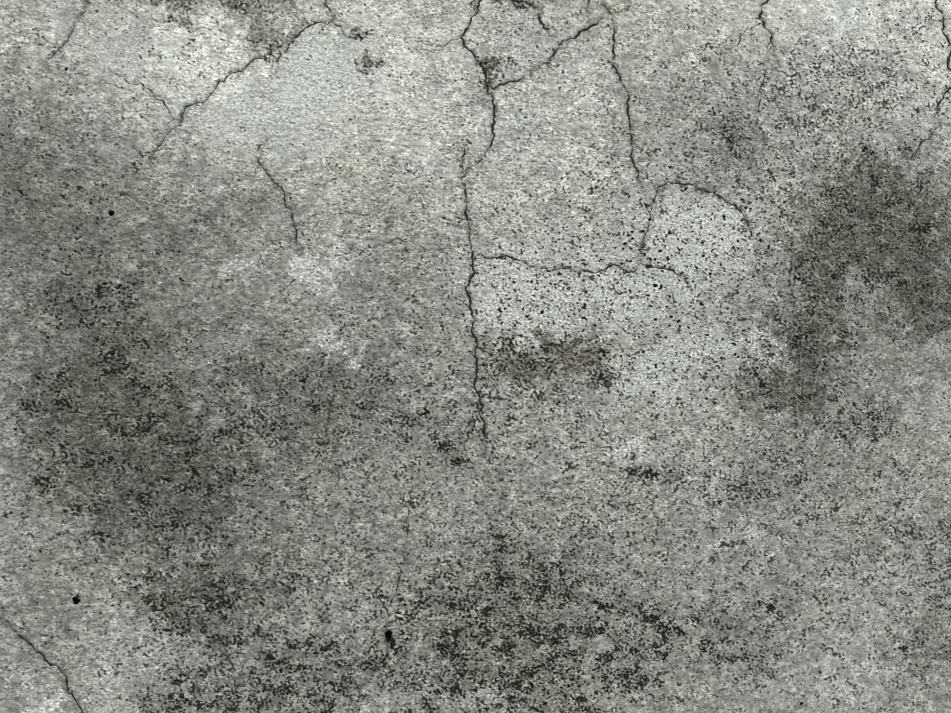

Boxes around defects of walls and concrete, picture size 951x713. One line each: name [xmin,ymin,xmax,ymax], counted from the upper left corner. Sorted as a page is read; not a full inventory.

crack [114,0,346,153]
crack [258,144,297,240]
crack [420,0,753,455]
water stain [668,86,762,168]
water stain [700,8,951,515]
crack [935,0,951,109]
water stain [2,179,821,713]